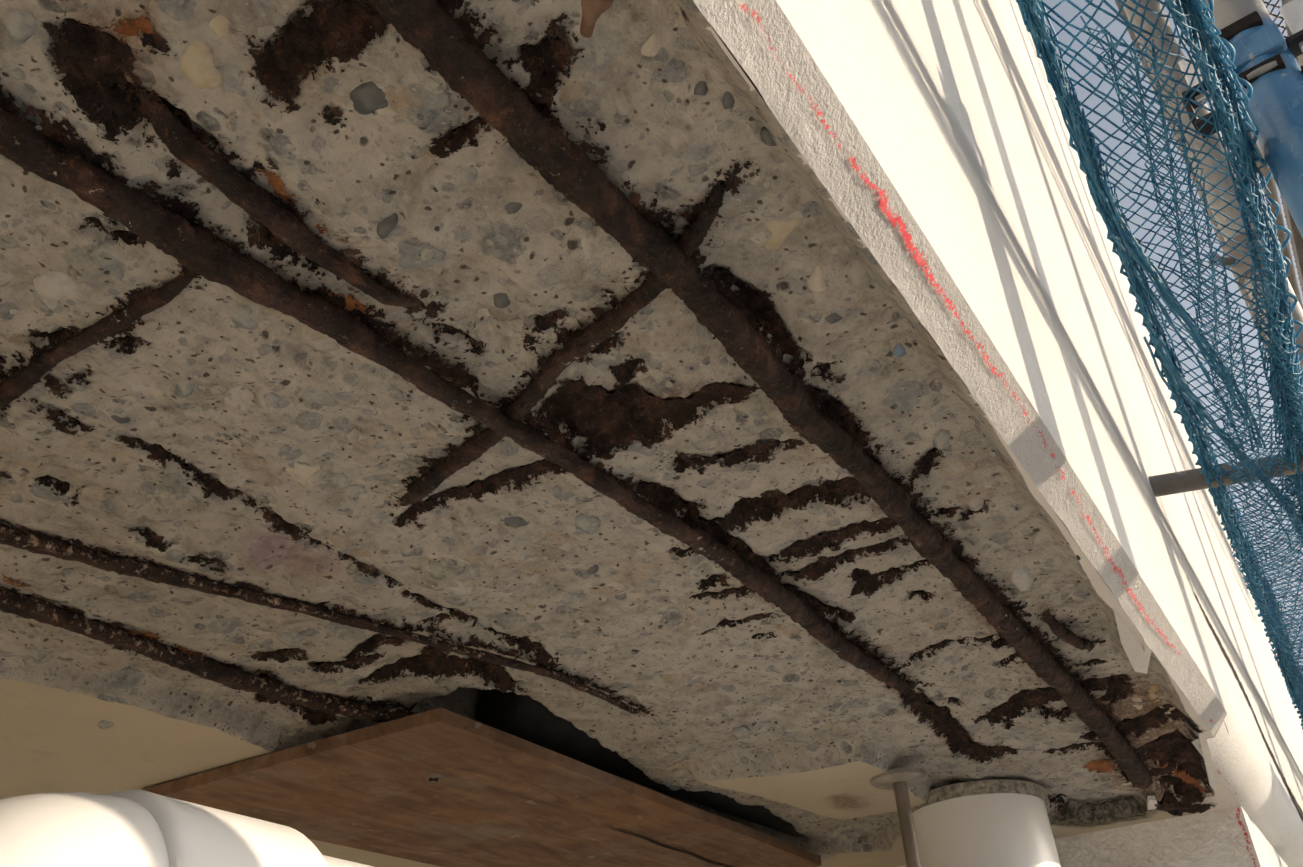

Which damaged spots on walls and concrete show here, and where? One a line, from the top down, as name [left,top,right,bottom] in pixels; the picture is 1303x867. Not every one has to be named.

rust [1,364,95,435]
spalling [0,0,650,411]
rust [0,0,652,413]
rust [0,435,660,726]
rust [384,414,570,533]
spalling [0,275,1183,861]
spalling [449,0,1218,798]
rust [522,159,1216,816]
rust [1046,793,1067,821]